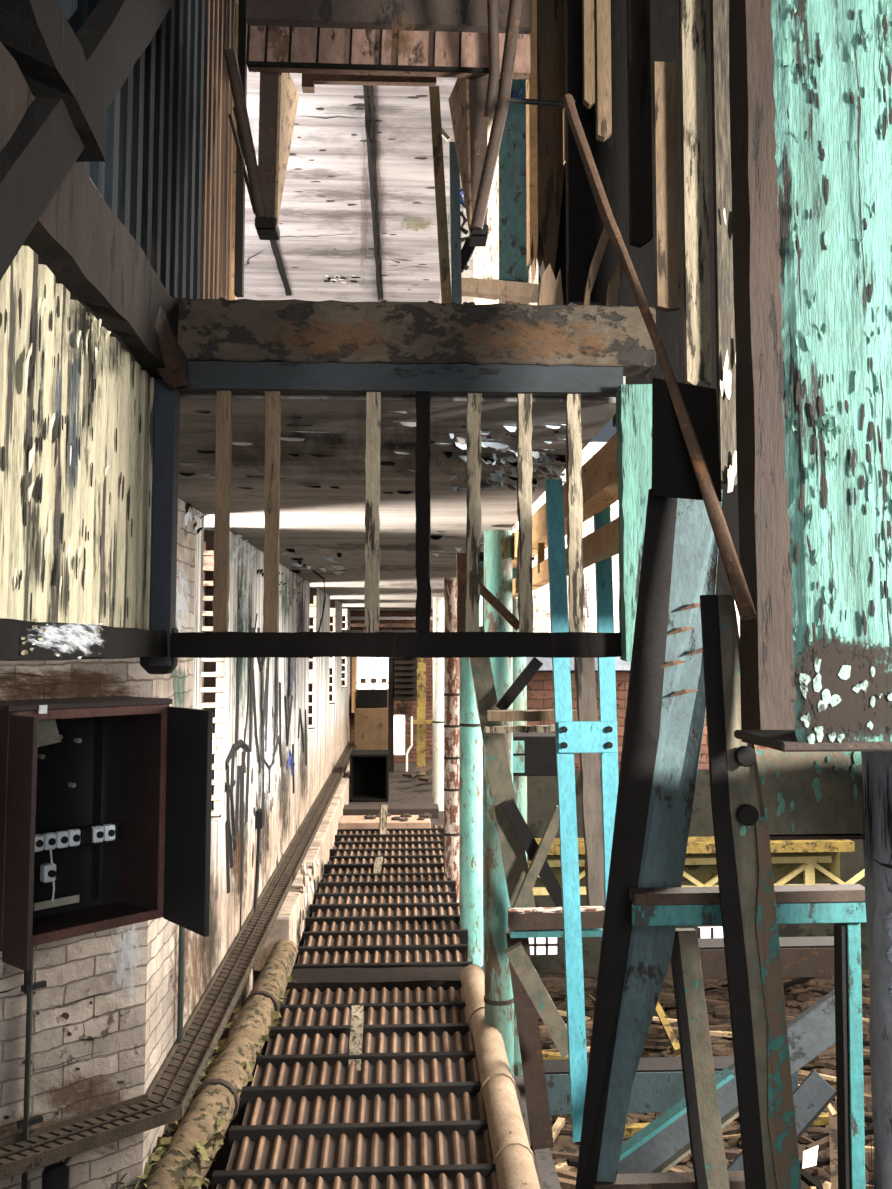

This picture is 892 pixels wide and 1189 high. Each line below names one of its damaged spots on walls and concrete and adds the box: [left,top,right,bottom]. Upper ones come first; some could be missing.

peeling [779,0,823,109]
peeling [850,0,892,140]
peeling [792,201,812,259]
peeling [822,231,830,250]
peeling [859,201,875,257]
peeling [785,284,892,803]
peeling [740,792,794,836]